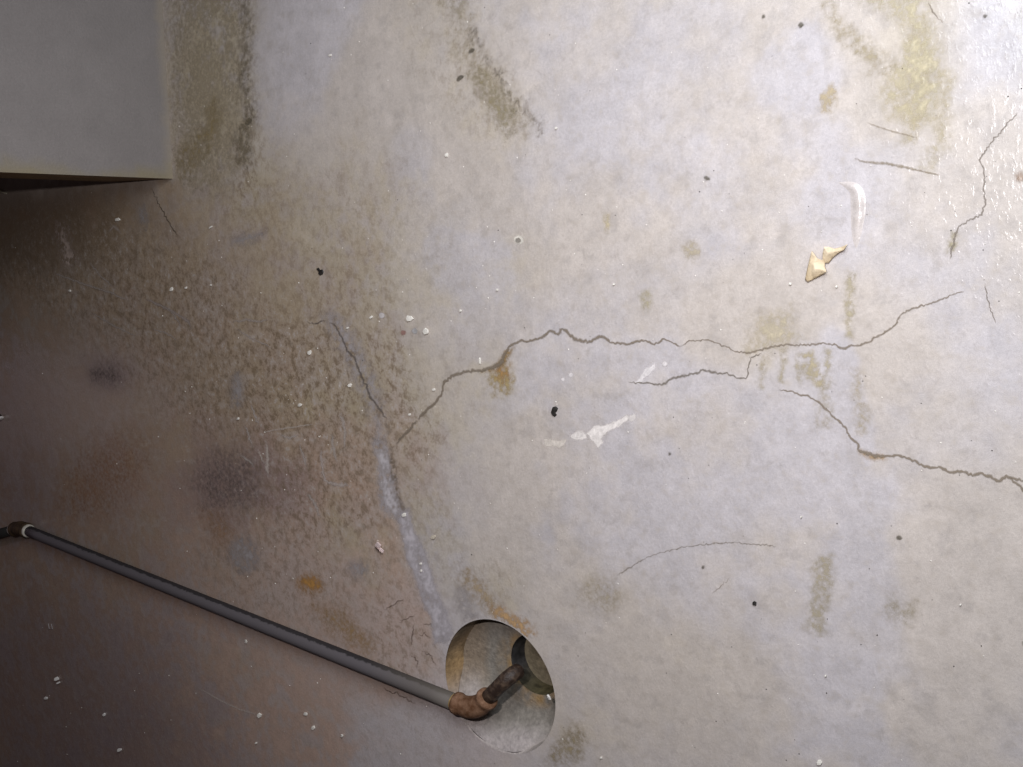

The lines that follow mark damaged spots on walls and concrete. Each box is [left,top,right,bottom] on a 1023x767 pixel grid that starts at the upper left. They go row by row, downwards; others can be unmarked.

crack [315,321,383,414]
rust [488,351,514,395]
crack [397,292,960,443]
crack [781,389,1023,491]